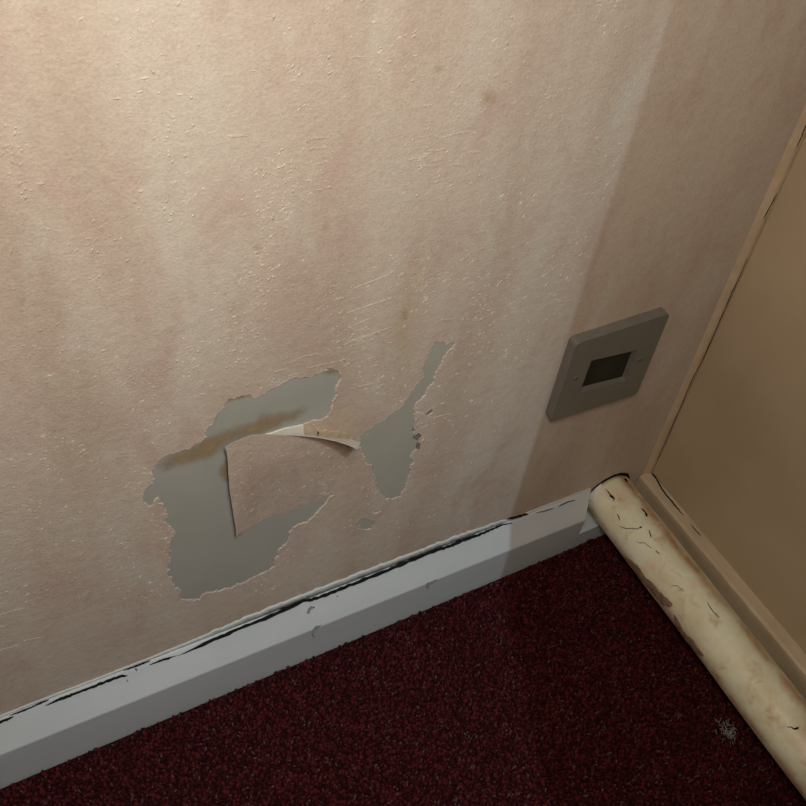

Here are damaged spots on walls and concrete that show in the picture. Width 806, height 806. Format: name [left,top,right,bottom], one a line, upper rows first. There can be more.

peeling [142,341,457,601]
crack [0,473,660,724]
crack [652,258,748,535]